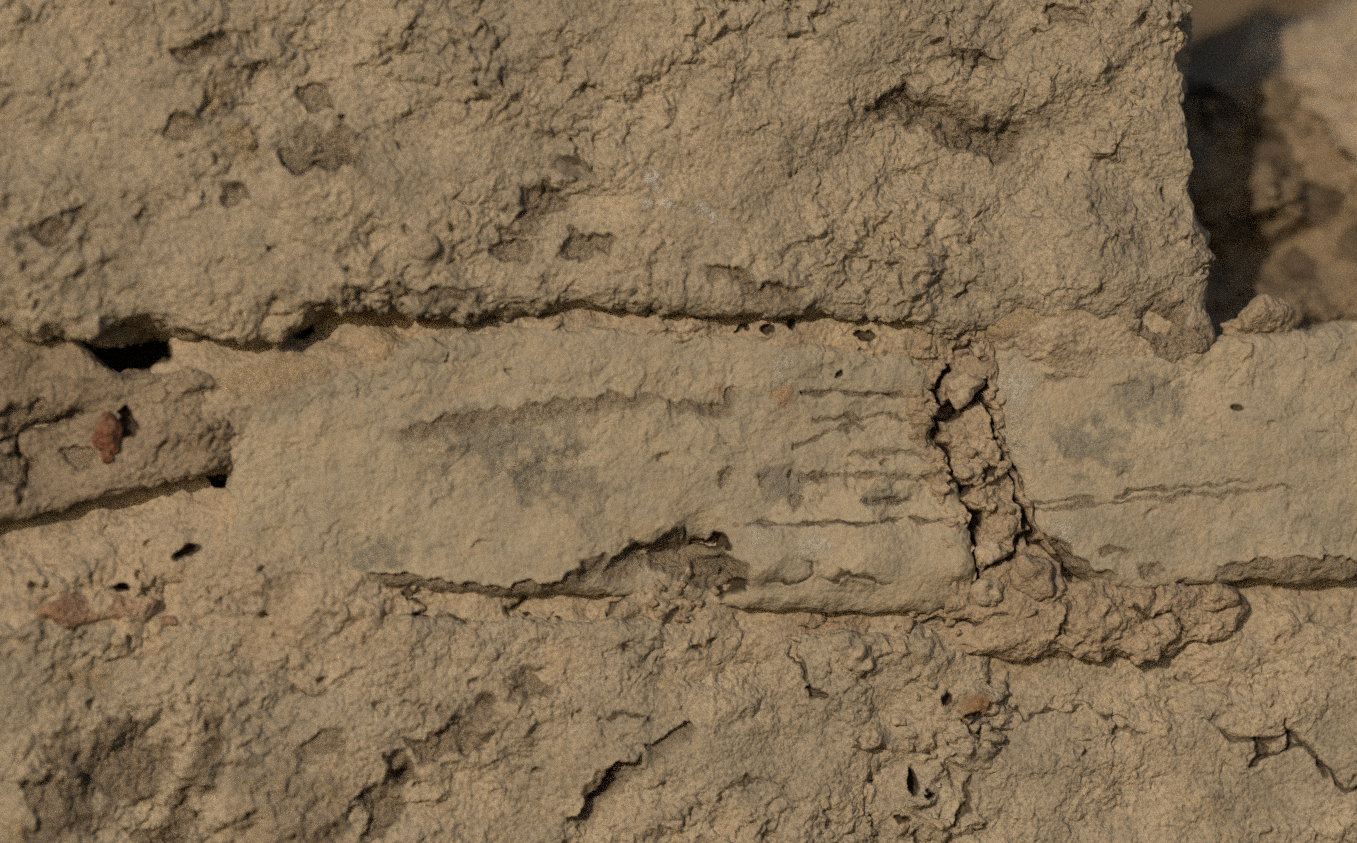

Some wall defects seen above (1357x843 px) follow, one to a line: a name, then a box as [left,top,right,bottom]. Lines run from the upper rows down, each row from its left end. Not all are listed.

spalling [1184,76,1357,262]
spalling [1276,246,1319,280]
crack [930,343,1063,582]
crack [921,613,1008,626]
crack [1057,602,1072,636]
crack [1128,603,1188,633]
crack [1219,720,1357,793]